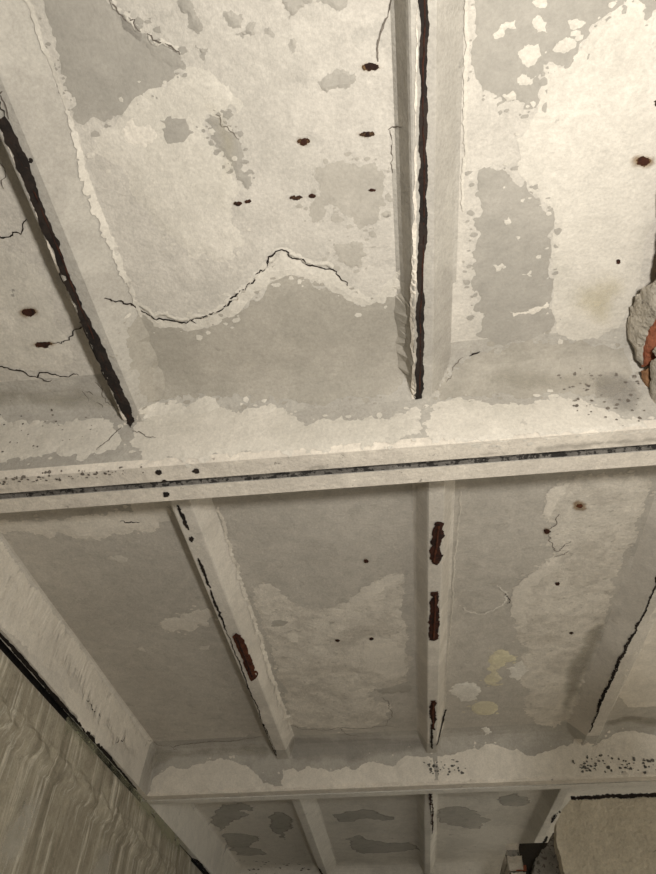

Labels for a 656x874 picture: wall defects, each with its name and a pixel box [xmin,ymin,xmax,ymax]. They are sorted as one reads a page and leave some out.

corrosion [362,63,379,71]
crack [376,0,392,60]
peeling [459,0,656,119]
peeling [0,0,430,428]
crack [105,247,348,324]
peeling [433,166,656,404]
crack [0,366,113,408]
peeling [362,638,409,683]
crack [589,577,656,733]